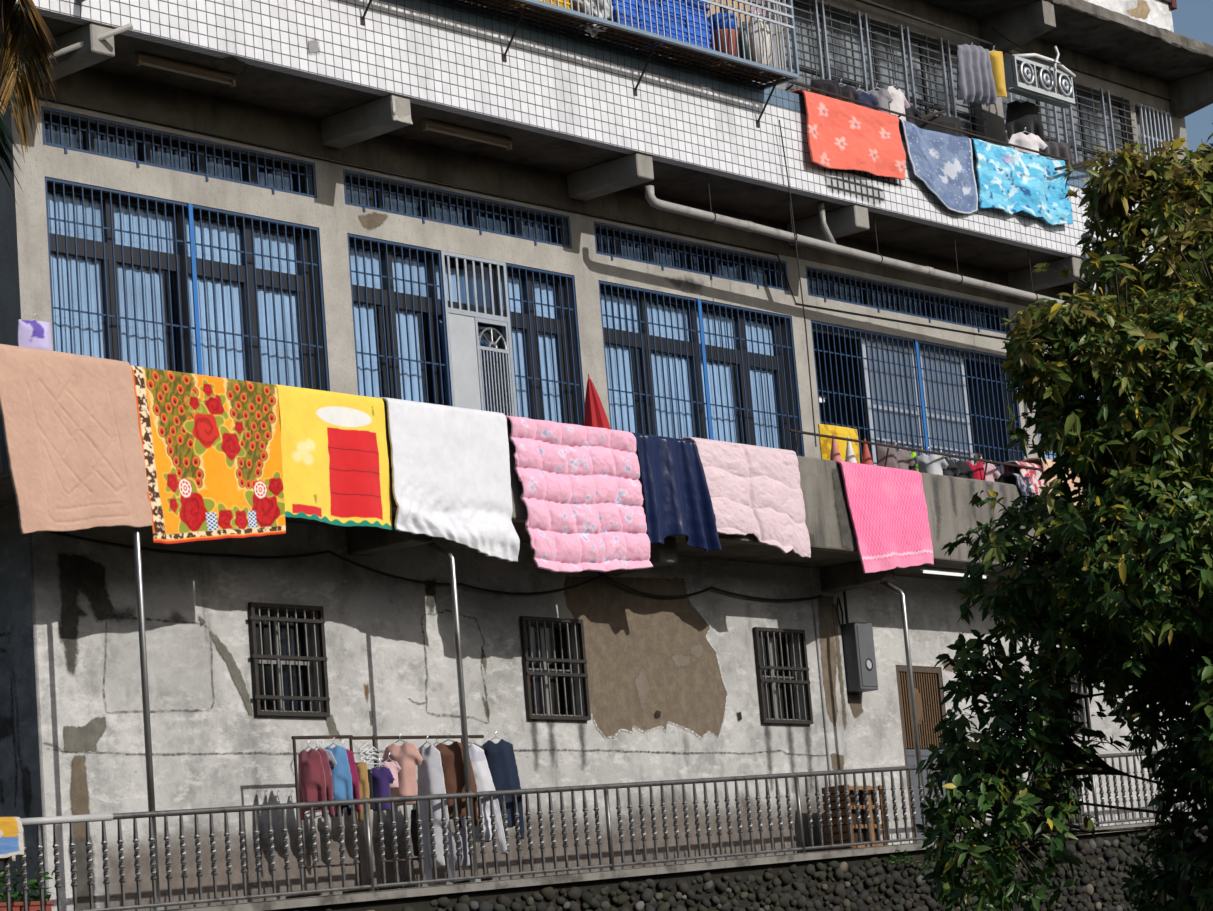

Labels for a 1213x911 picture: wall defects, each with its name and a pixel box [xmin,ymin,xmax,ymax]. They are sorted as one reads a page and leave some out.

peeling [1127,0,1150,19]
crack [0,632,298,806]
crack [103,615,214,713]
crack [409,610,490,723]
peeling [564,576,742,739]
crack [515,748,824,756]